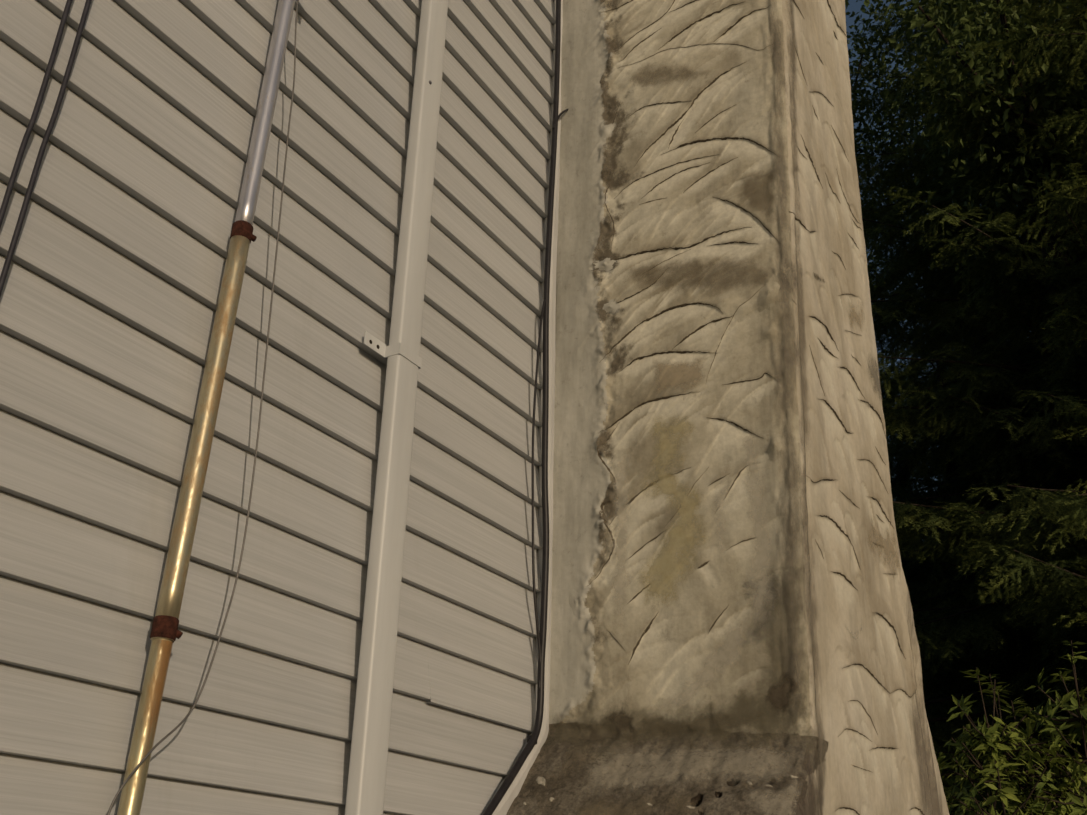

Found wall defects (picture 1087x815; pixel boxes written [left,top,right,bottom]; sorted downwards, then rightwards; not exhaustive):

crack [591,0,862,303]
crack [589,287,778,585]
crack [807,316,893,591]
crack [608,583,659,664]
crack [877,613,906,659]
crack [842,663,916,698]
crack [841,700,899,772]
spalling [589,744,802,815]